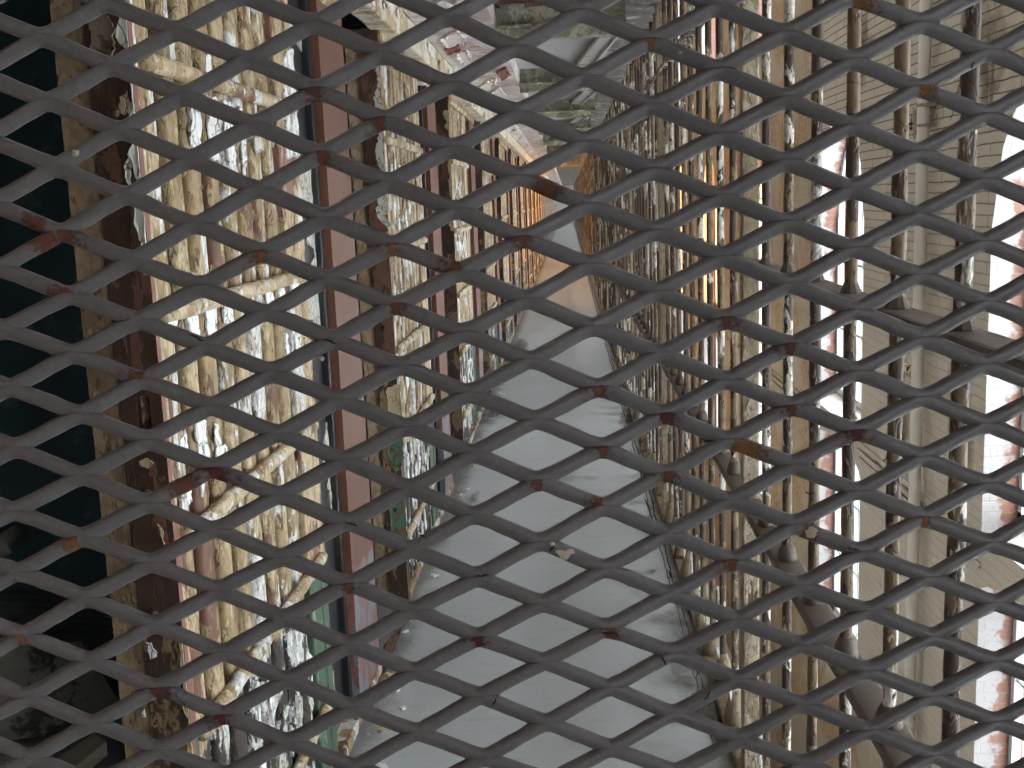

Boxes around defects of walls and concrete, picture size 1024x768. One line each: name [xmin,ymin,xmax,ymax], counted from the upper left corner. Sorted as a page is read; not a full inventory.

peeling [283,40,302,71]
peeling [283,84,296,98]
peeling [187,107,234,148]
peeling [284,114,299,136]
peeling [211,137,264,176]
rust [532,177,564,203]
rust [21,212,86,254]
peeling [178,420,227,457]
rust [732,438,768,459]
rust [169,467,241,497]
peeling [255,691,314,732]
peeling [221,724,229,754]